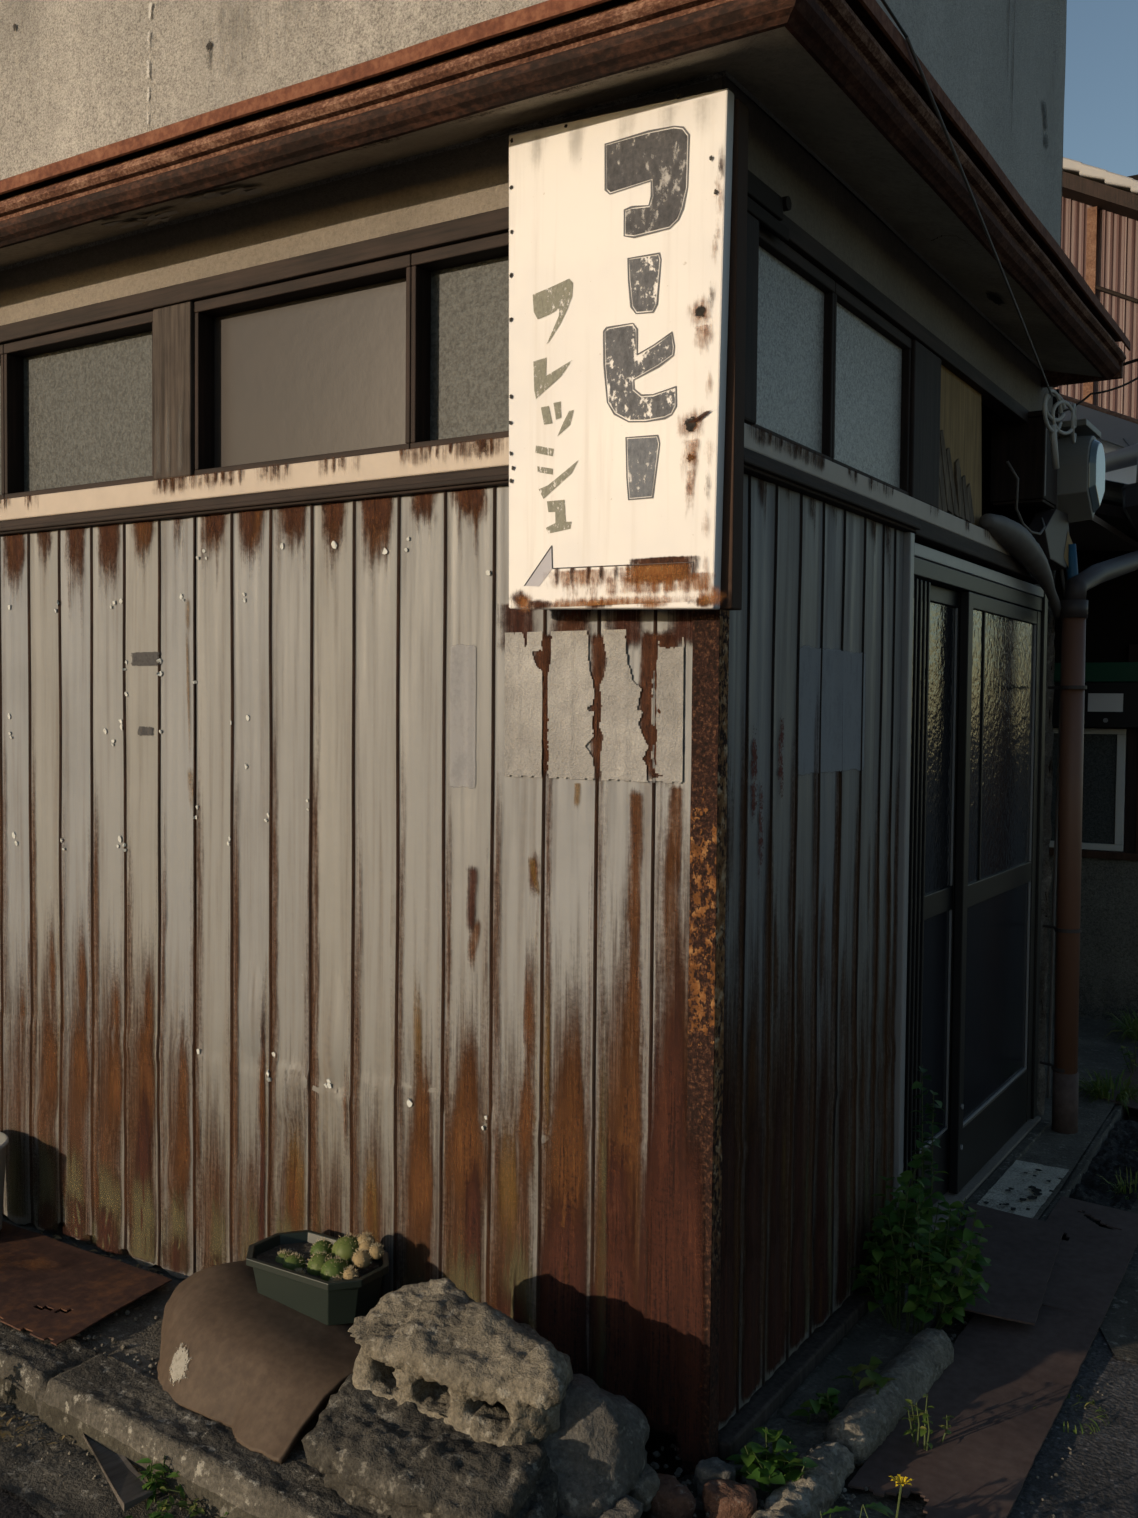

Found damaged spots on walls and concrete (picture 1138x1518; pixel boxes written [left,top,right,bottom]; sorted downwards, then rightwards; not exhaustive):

rust [158,469,241,491]
rust [201,497,392,561]
rust [412,493,434,521]
rust [399,438,499,461]
rust [452,488,487,545]
rust [4,521,154,606]
rust [0,556,720,1437]
rust [812,772,899,1327]